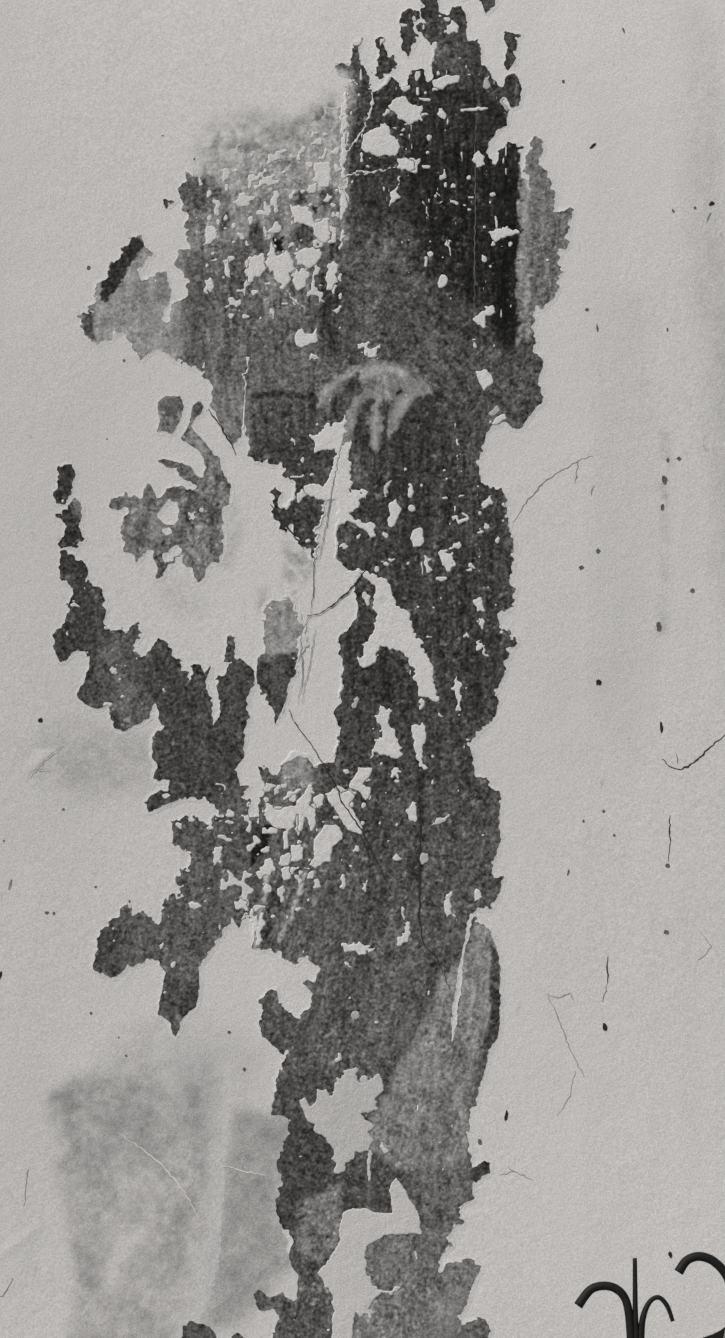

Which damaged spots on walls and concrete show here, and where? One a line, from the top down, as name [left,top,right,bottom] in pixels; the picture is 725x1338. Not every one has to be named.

crack [514,456,594,521]
peeling [49,0,576,1338]
crack [662,735,725,770]